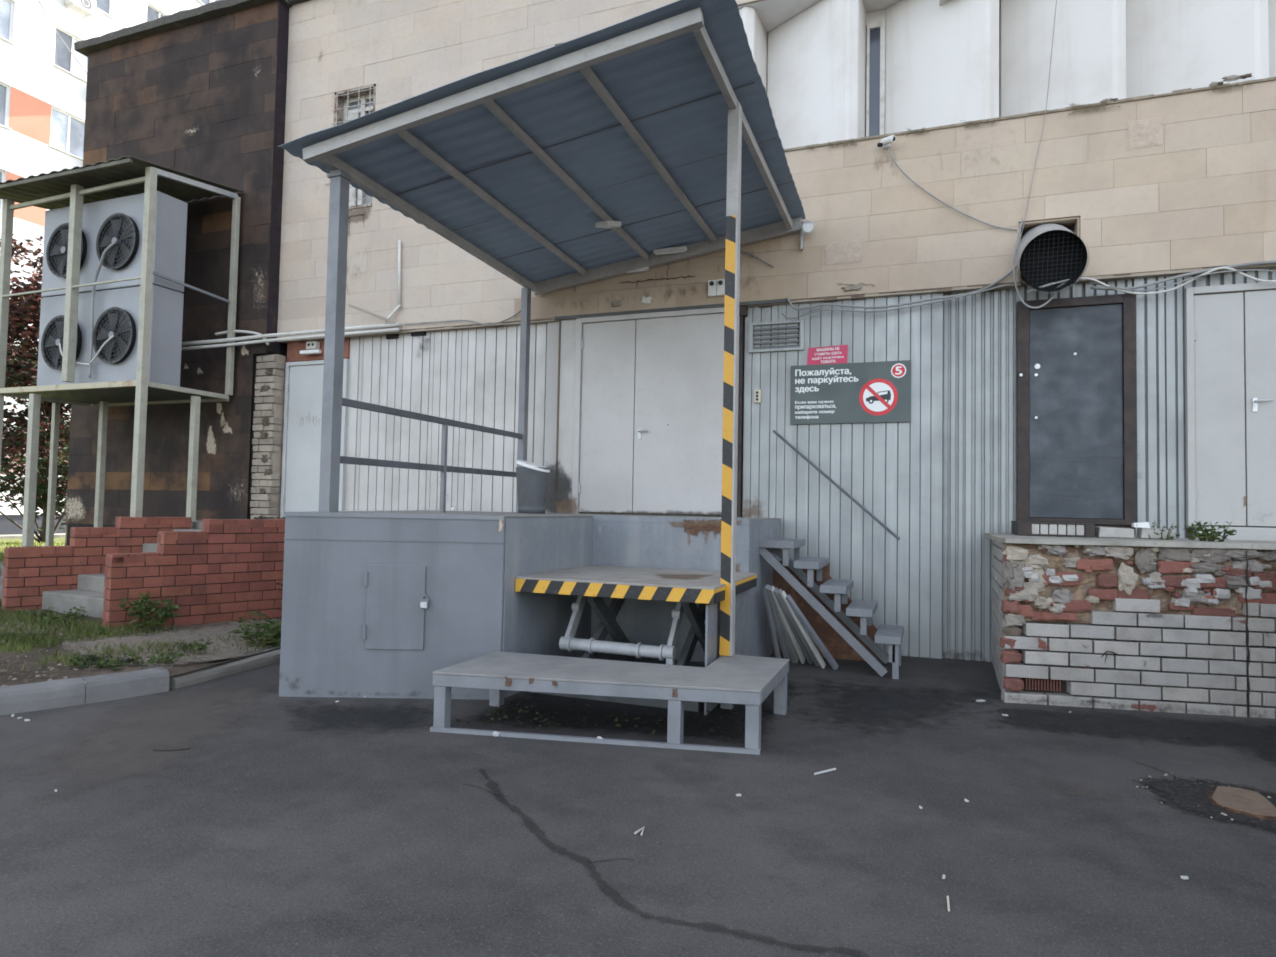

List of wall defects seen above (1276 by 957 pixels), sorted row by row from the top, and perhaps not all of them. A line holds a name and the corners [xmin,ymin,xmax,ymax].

rust [671,520,721,543]
spalling [999,543,1276,692]